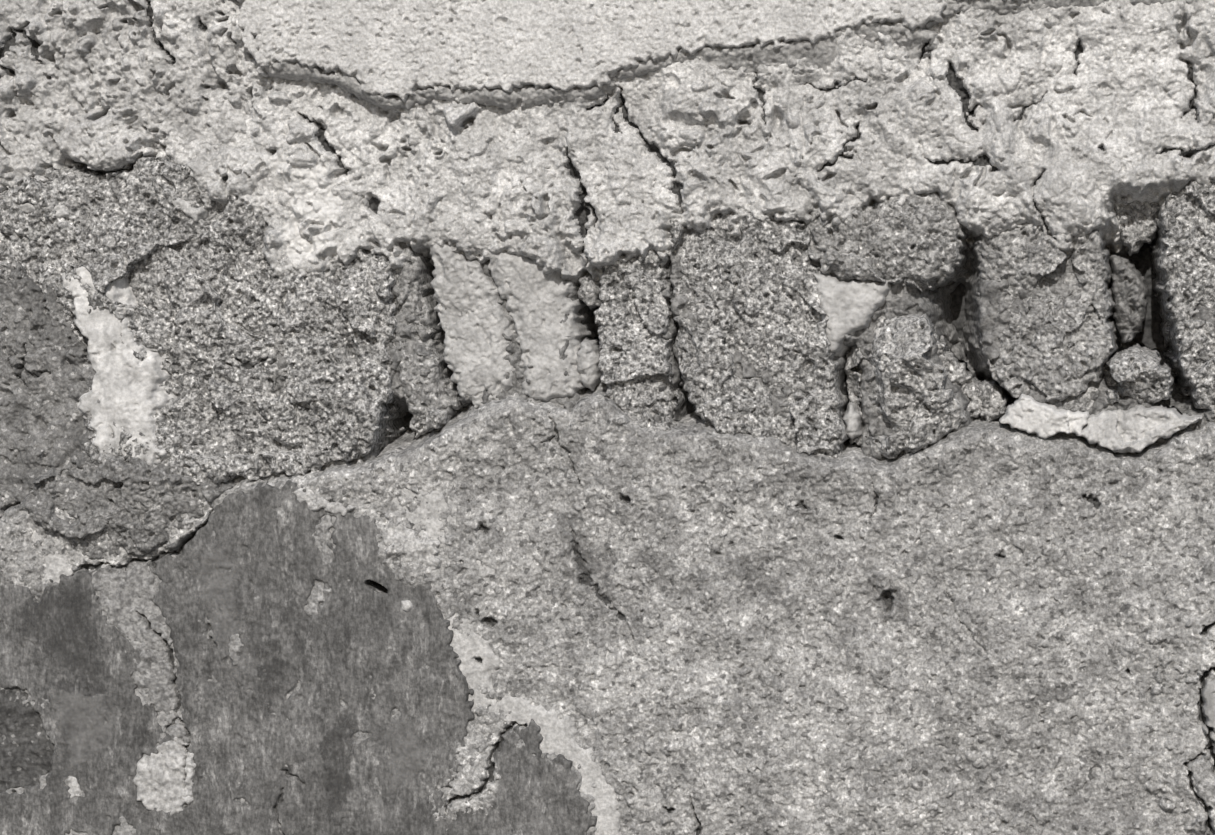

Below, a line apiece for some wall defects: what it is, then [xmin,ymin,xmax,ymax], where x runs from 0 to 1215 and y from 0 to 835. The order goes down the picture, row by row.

crack [566,153,598,254]
spalling [0,0,1215,356]
crack [586,88,683,208]
crack [822,125,861,168]
crack [919,41,998,172]
crack [1161,63,1215,157]
spalling [403,412,413,432]
spalling [839,368,862,412]
crack [79,524,207,571]
spalling [0,687,55,793]
crack [446,721,528,812]
peeling [1190,756,1215,835]